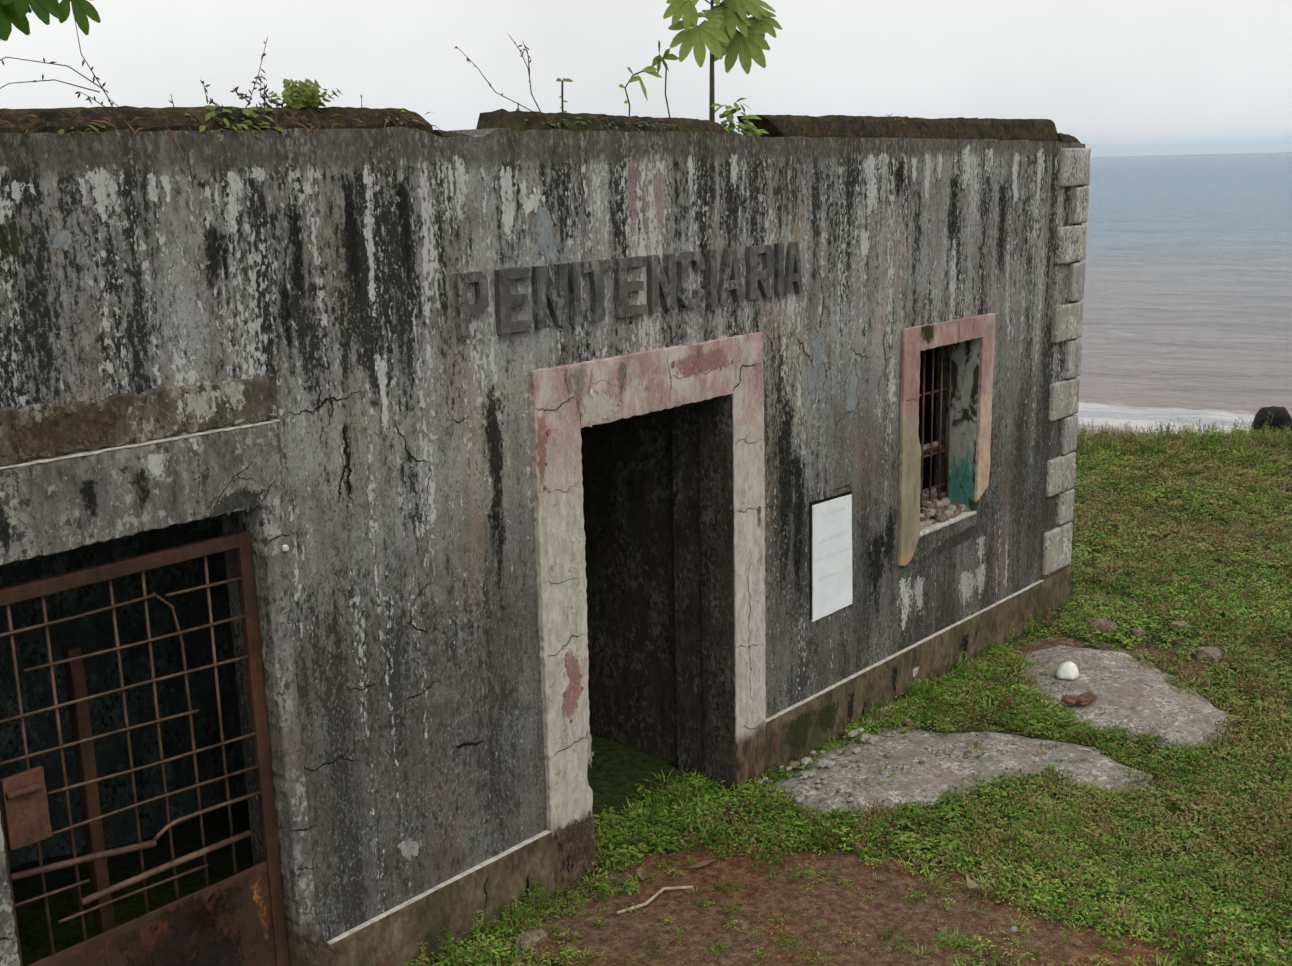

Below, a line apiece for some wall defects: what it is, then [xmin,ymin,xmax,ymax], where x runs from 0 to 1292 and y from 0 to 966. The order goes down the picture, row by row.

water stain [204,166,264,300]
water stain [340,163,379,317]
water stain [499,165,528,248]
water stain [859,145,1020,281]
crack [290,383,358,503]
water stain [373,350,390,465]
water stain [482,372,507,615]
peeling [582,388,621,427]
peeling [671,347,734,377]
spalling [925,521,981,560]
peeling [561,652,584,723]
corrosion [251,879,267,937]